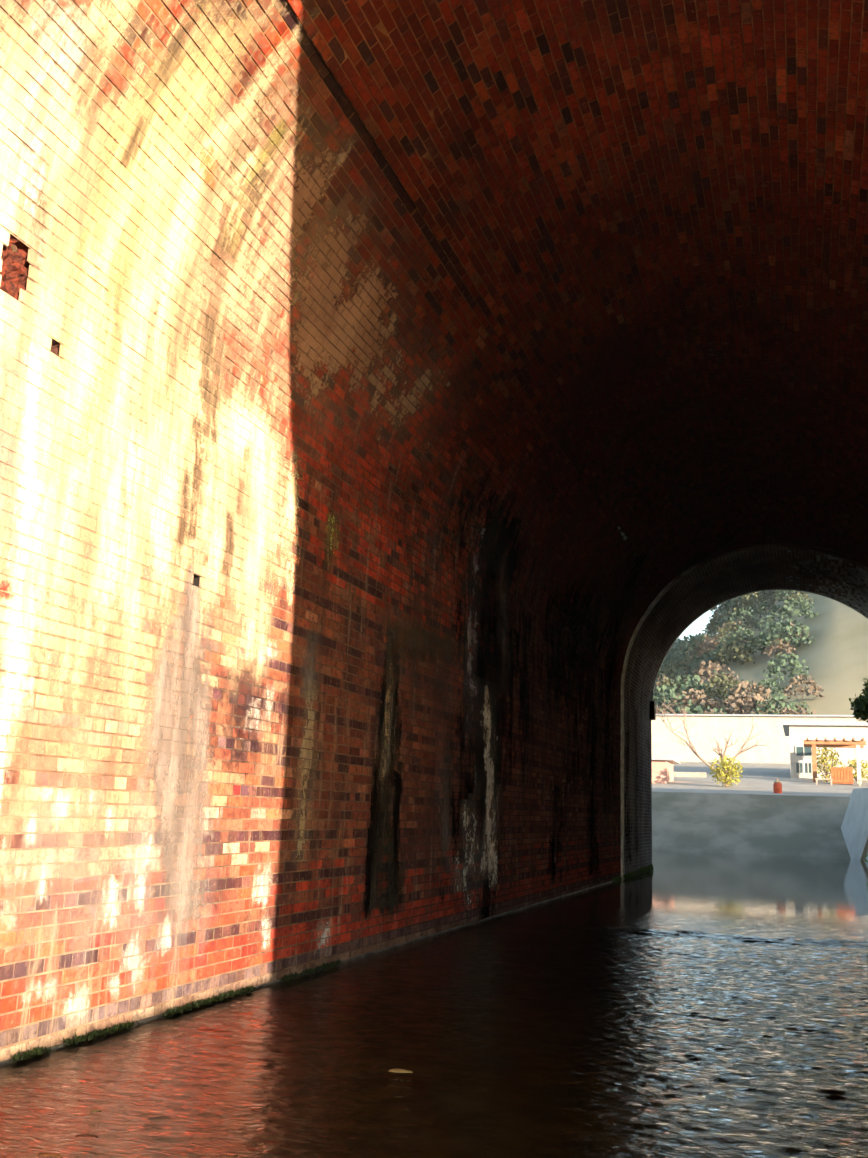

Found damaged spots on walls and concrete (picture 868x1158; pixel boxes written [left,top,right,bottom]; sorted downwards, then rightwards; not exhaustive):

spalling [0,233,43,300]
leakage [0,0,450,944]
leakage [364,476,649,923]
leakage [125,943,140,980]